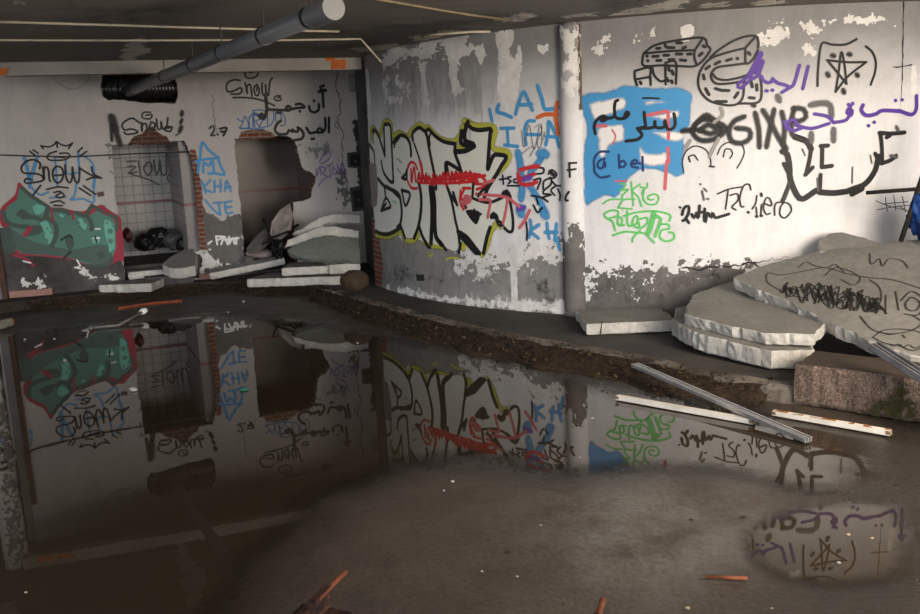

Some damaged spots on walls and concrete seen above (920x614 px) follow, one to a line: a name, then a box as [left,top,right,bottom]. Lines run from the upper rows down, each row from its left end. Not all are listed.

spalling [0,62,11,77]
peeling [326,29,487,123]
peeling [493,12,536,114]
peeling [559,0,730,105]
peeling [757,12,896,57]
peeling [335,69,755,318]
peeling [0,228,126,298]